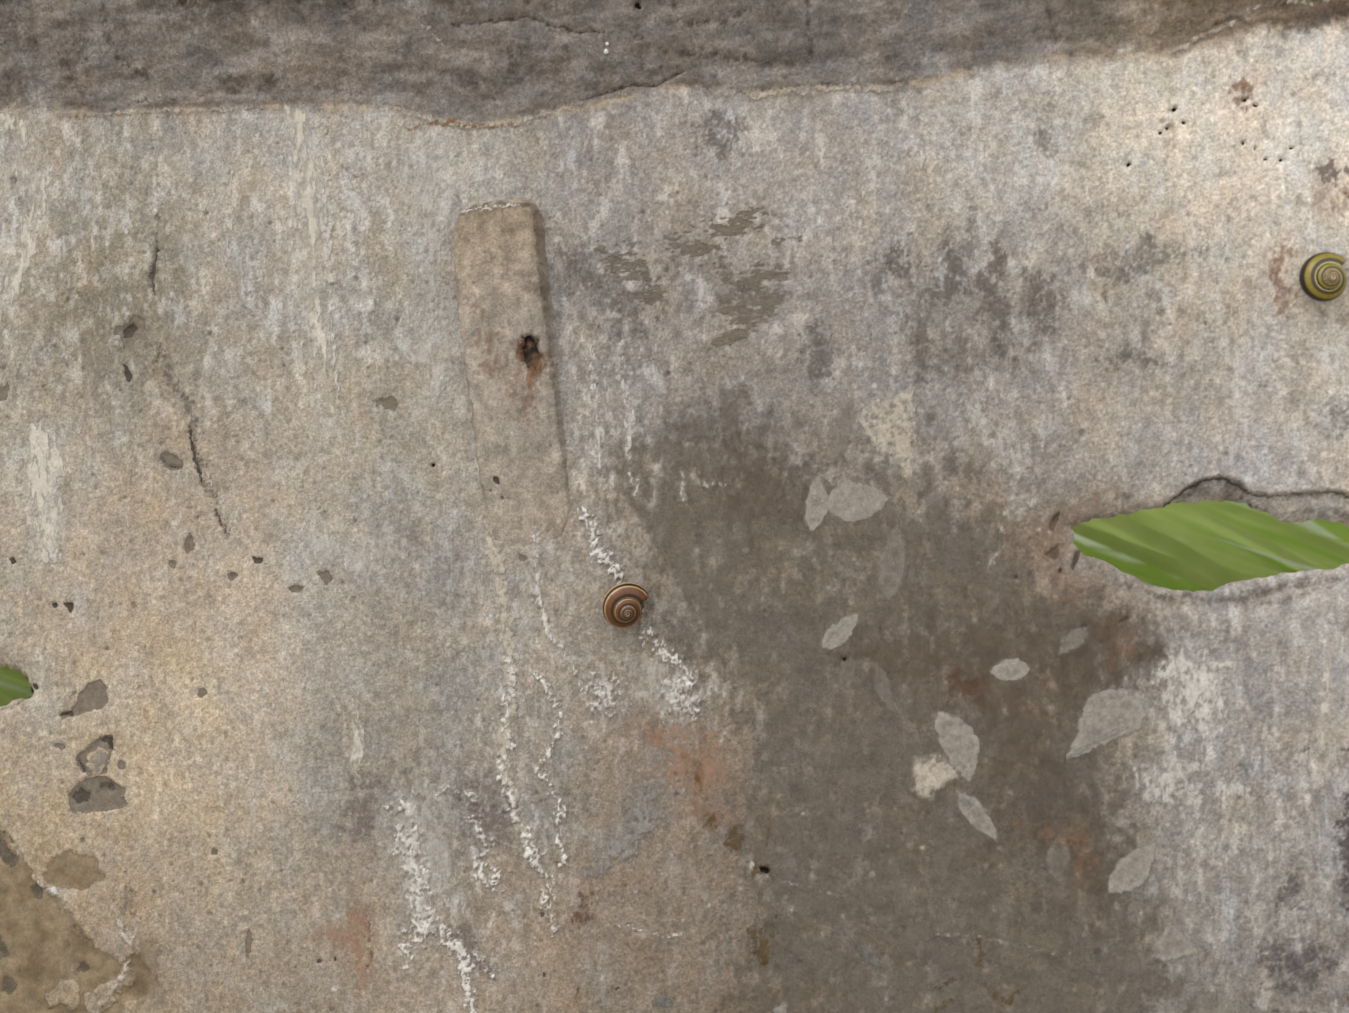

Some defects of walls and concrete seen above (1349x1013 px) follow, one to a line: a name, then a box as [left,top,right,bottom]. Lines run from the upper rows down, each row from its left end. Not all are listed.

crack [149,241,160,296]
crack [158,345,227,539]
rust [516,335,547,389]
crack [1162,477,1349,508]
leakage [335,527,622,1013]
leakage [577,344,1202,1013]
leakage [1134,644,1235,739]
peeling [0,831,154,1013]